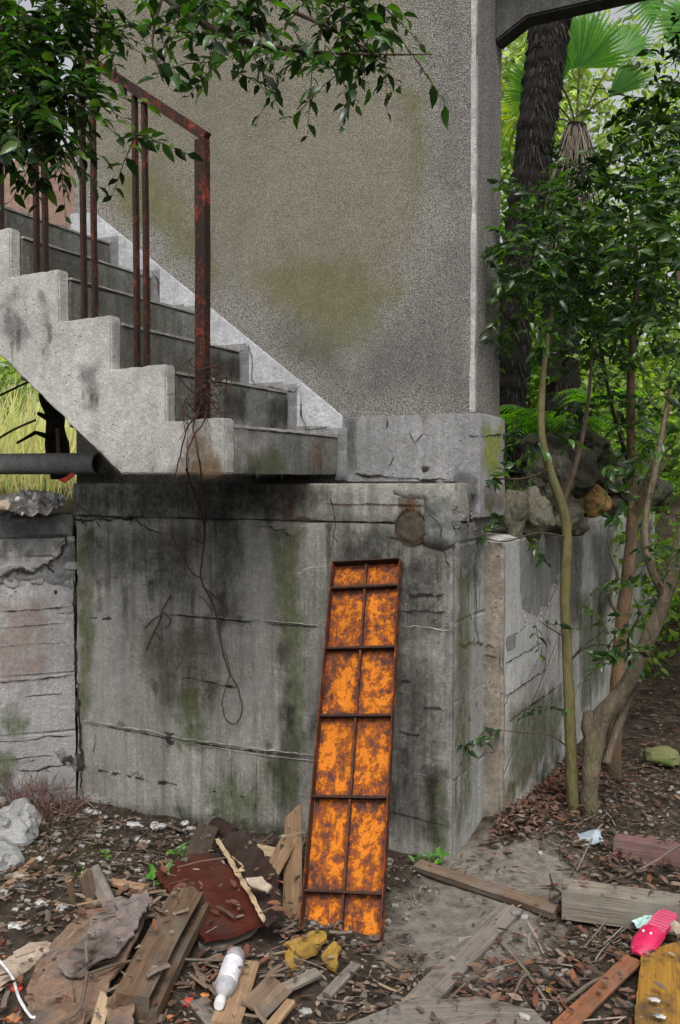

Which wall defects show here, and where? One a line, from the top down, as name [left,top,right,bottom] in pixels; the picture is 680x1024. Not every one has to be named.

spalling [0,536,78,595]
crack [0,517,314,810]
leakage [76,484,315,787]
crack [286,419,458,577]